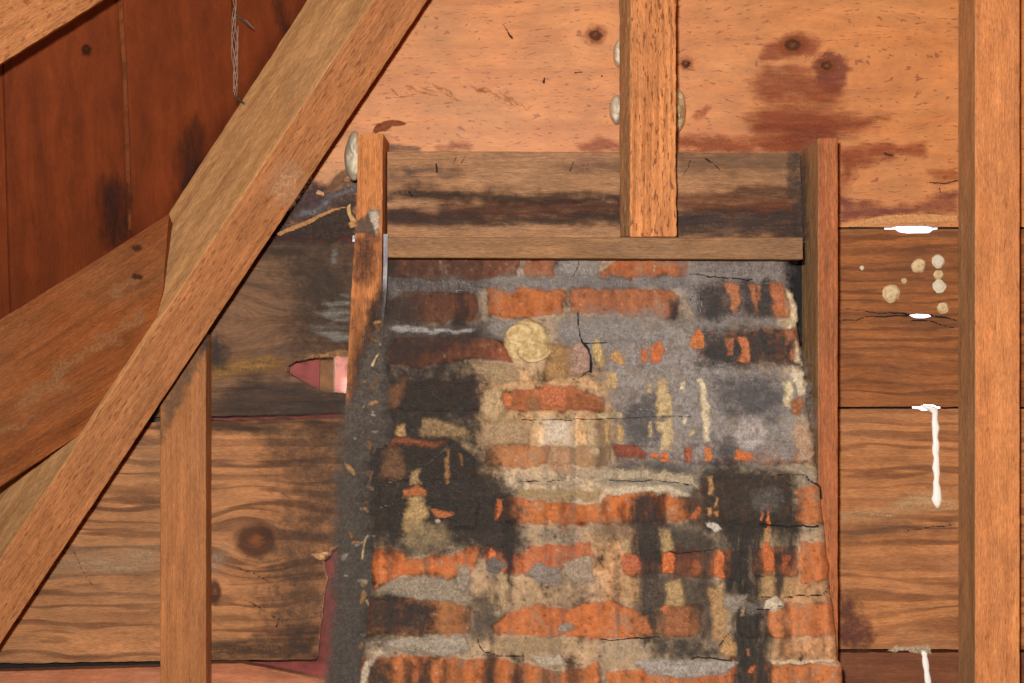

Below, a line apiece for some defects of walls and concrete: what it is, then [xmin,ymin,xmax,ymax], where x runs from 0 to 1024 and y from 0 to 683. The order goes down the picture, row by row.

water stain [678,36,885,152]
water stain [841,144,924,181]
water stain [840,193,956,221]
crack [844,311,956,328]
crack [573,313,604,380]
water stain [889,645,931,654]